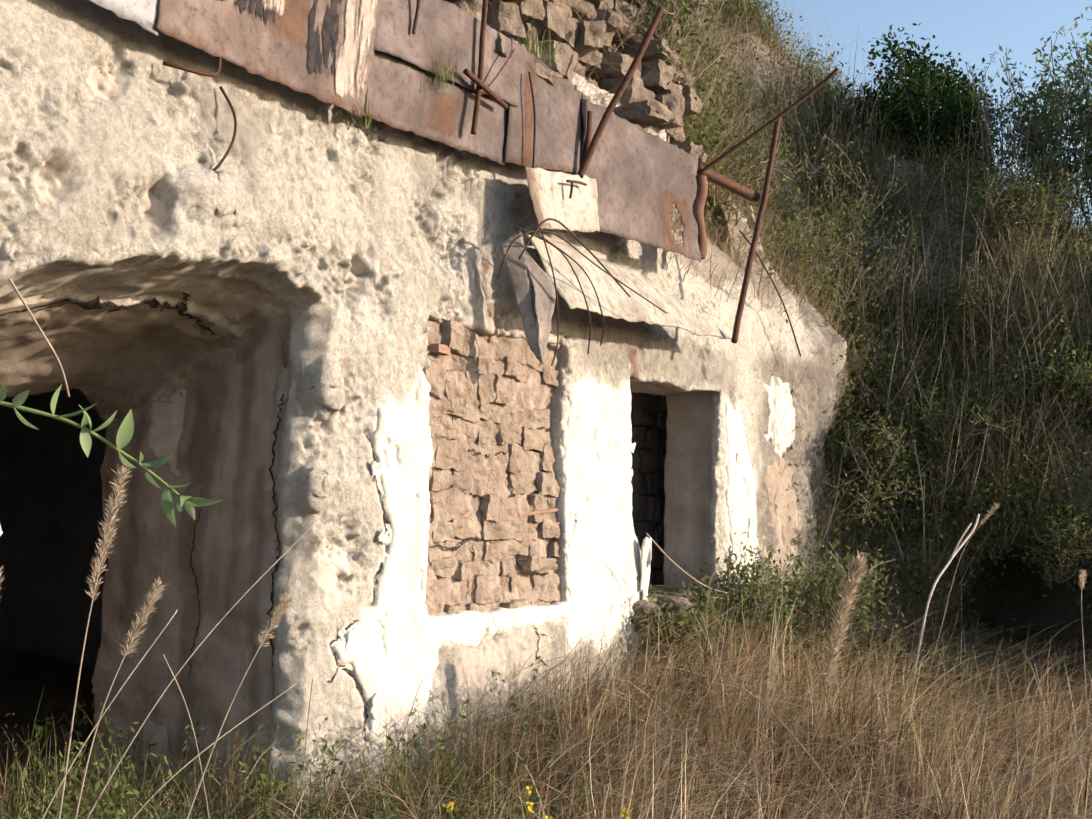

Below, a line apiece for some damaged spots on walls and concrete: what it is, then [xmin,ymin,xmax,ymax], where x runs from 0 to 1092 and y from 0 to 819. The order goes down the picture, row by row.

crack [0,293,224,337]
spalling [455,309,569,357]
crack [266,337,287,722]
flaking render [329,375,652,752]